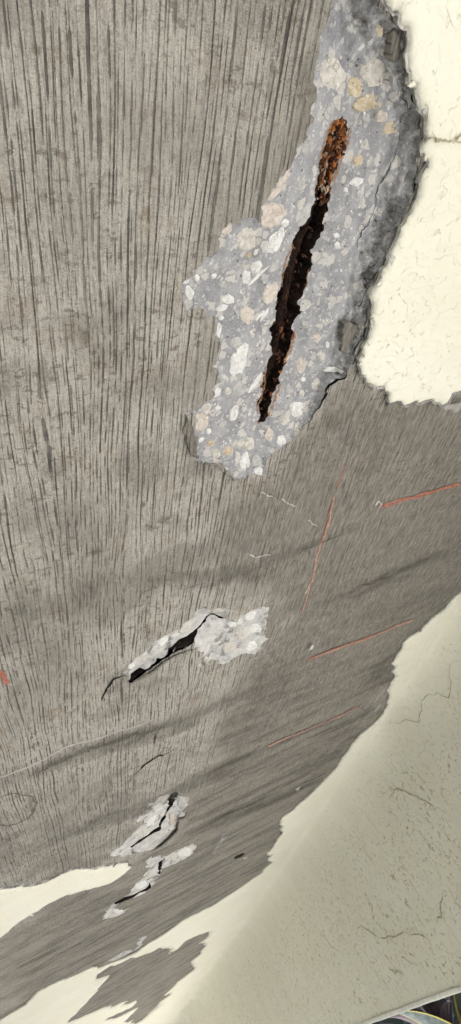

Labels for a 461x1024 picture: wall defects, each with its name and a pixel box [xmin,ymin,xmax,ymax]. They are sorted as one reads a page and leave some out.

spalling [181,0,461,481]
corrosion [301,465,347,614]
corrosion [375,483,460,508]
spalling [123,606,269,679]
spalling [0,792,197,919]